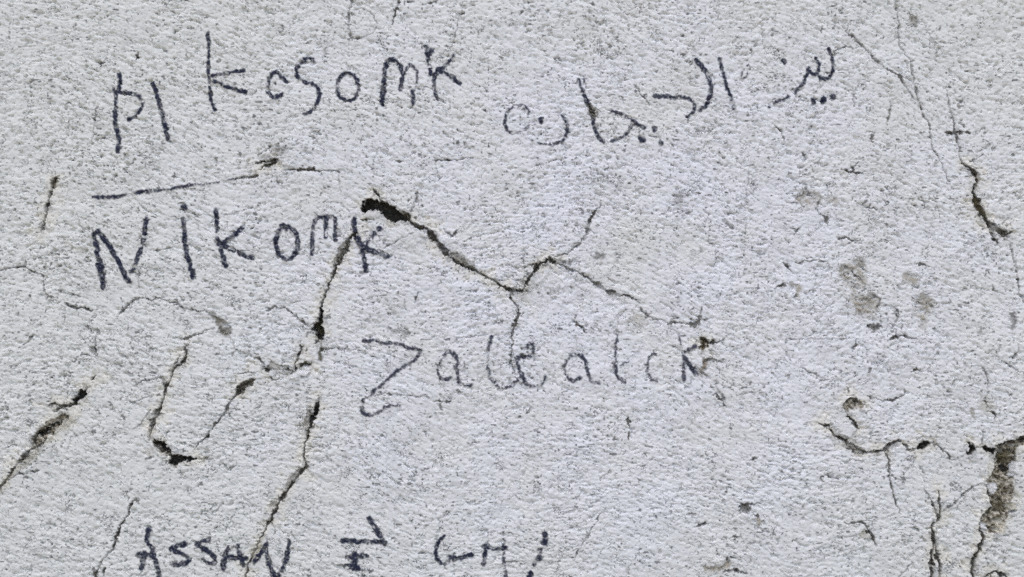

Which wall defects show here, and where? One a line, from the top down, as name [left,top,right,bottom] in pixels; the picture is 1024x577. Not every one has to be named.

crack [849,34,1012,243]
crack [268,191,596,358]
crack [591,281,707,328]
crack [203,372,255,440]
crack [246,402,320,577]
crack [821,423,951,504]
crack [928,494,950,577]
crack [970,529,1006,577]